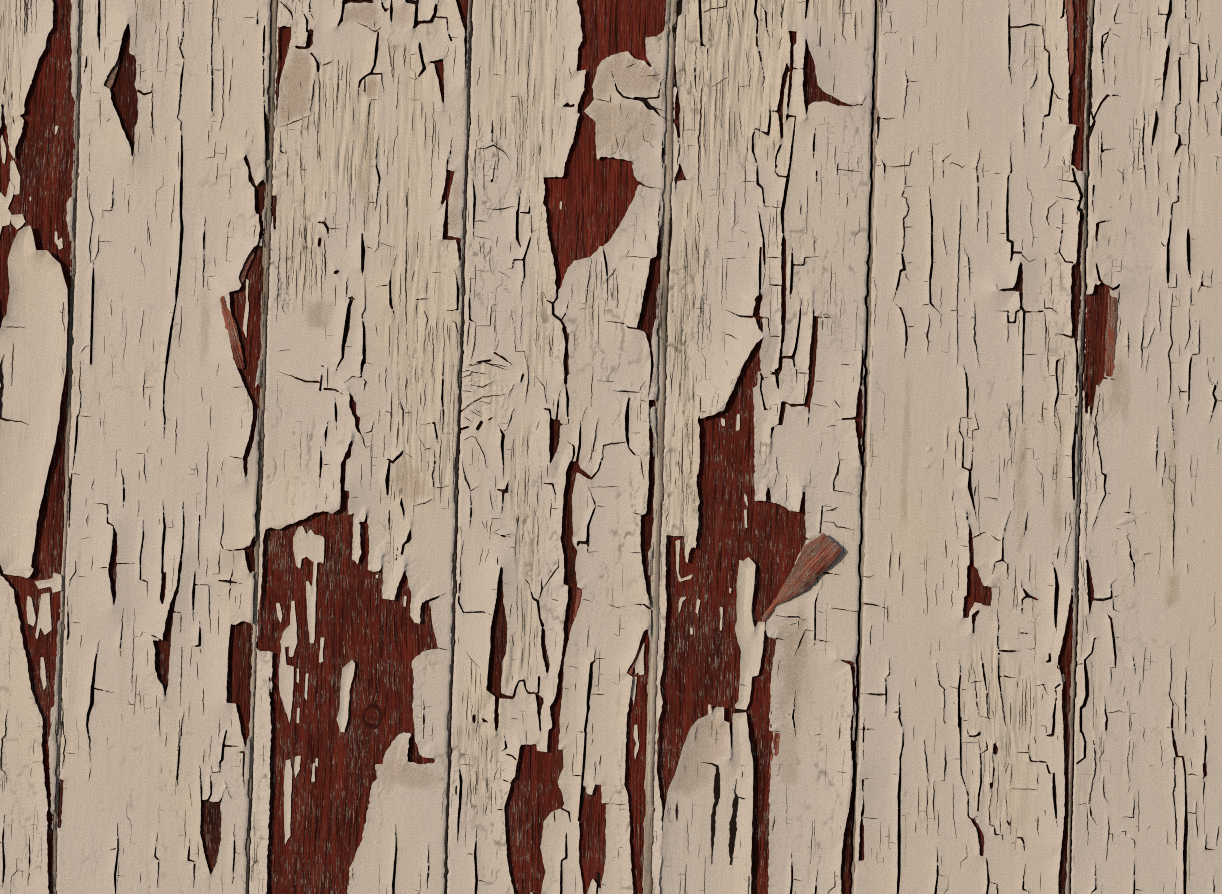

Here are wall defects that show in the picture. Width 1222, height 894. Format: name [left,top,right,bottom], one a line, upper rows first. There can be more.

peeling [104,23,141,156]
peeling [543,0,669,295]
peeling [1063,0,1088,173]
peeling [0,0,77,894]
crack [0,0,266,894]
peeling [227,393,439,894]
peeling [573,589,582,619]
peeling [624,229,842,894]
crack [245,0,1222,894]
peeling [1082,278,1117,417]
peeling [504,724,606,894]